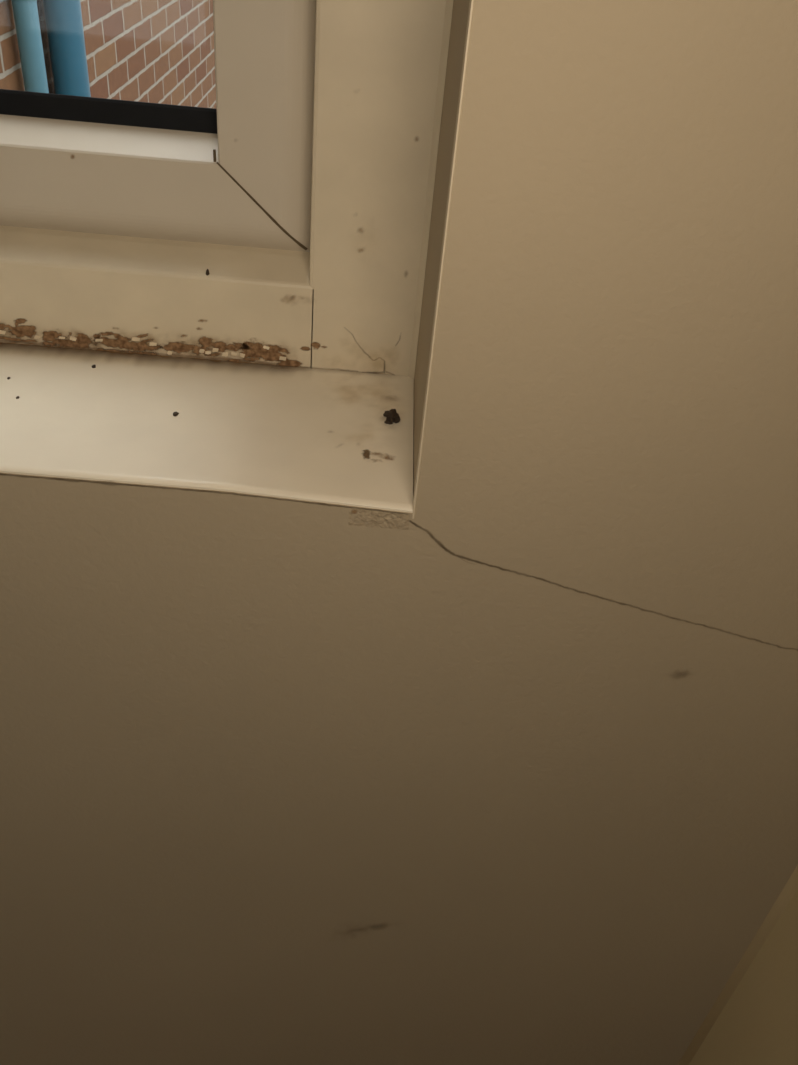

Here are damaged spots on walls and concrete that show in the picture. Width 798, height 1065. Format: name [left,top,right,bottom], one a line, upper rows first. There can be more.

peeling [0,318,326,367]